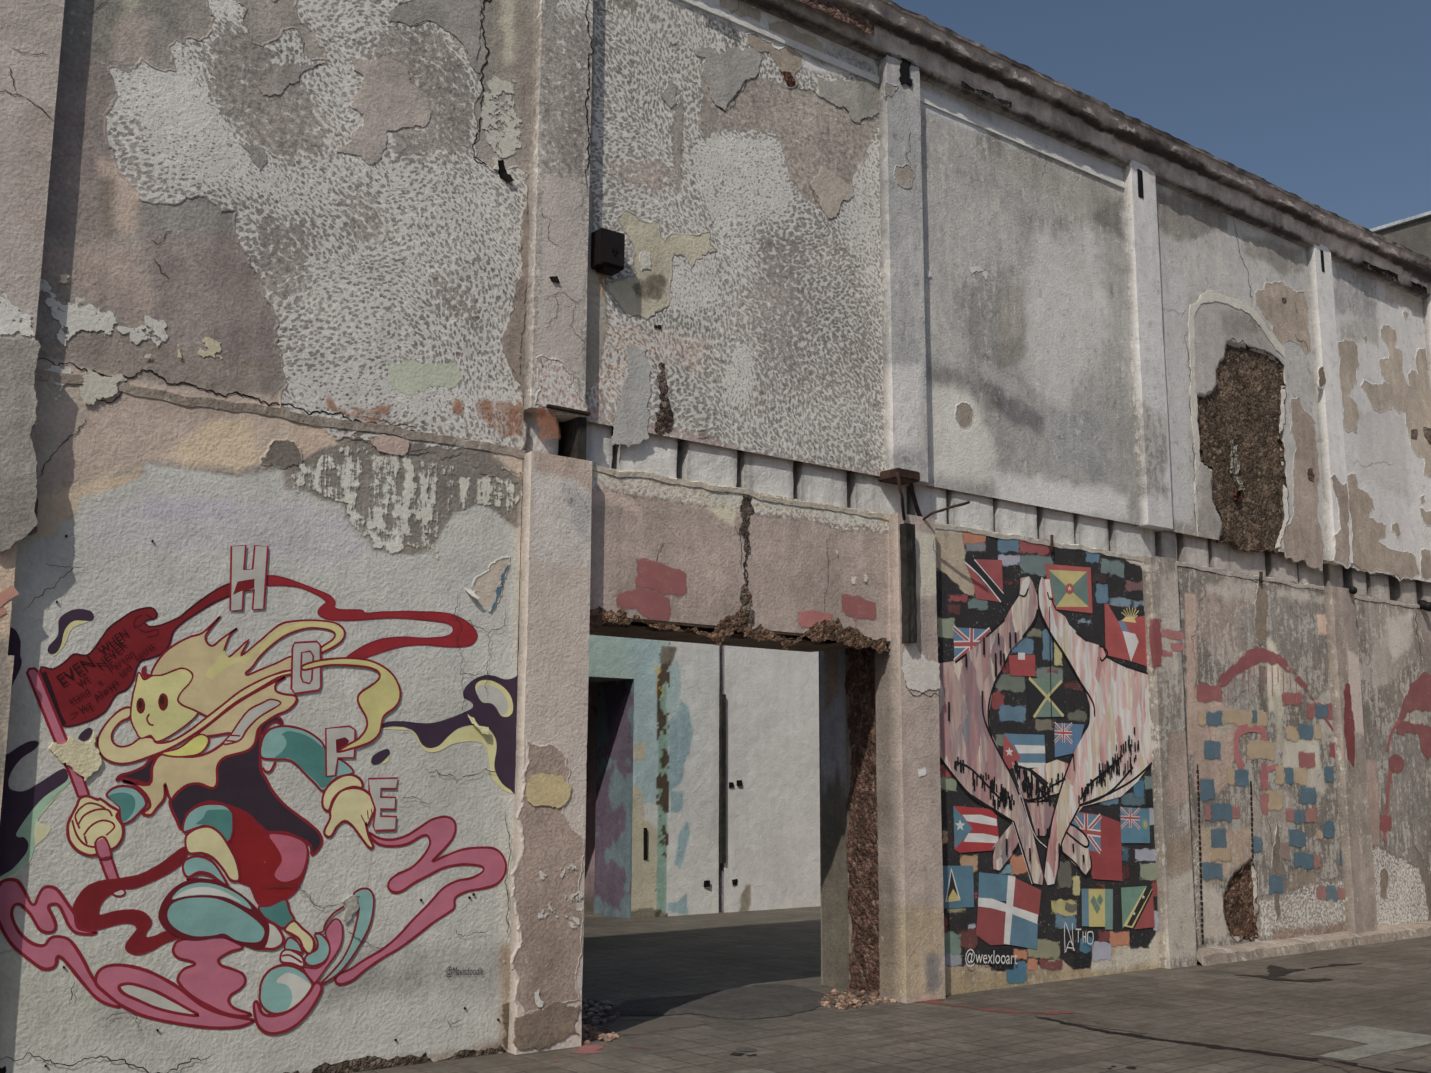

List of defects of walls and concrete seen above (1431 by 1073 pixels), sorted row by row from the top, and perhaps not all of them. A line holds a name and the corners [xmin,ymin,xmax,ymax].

crack [472,0,494,172]
peeling [0,274,222,359]
peeling [103,0,588,560]
peeling [606,209,717,329]
peeling [34,365,123,404]
crack [38,358,417,478]
spalling [1197,281,1431,582]
crack [735,524,748,585]
spalling [590,494,941,693]
peeling [48,732,102,781]
peeling [284,740,586,1073]
spalling [1223,822,1282,942]